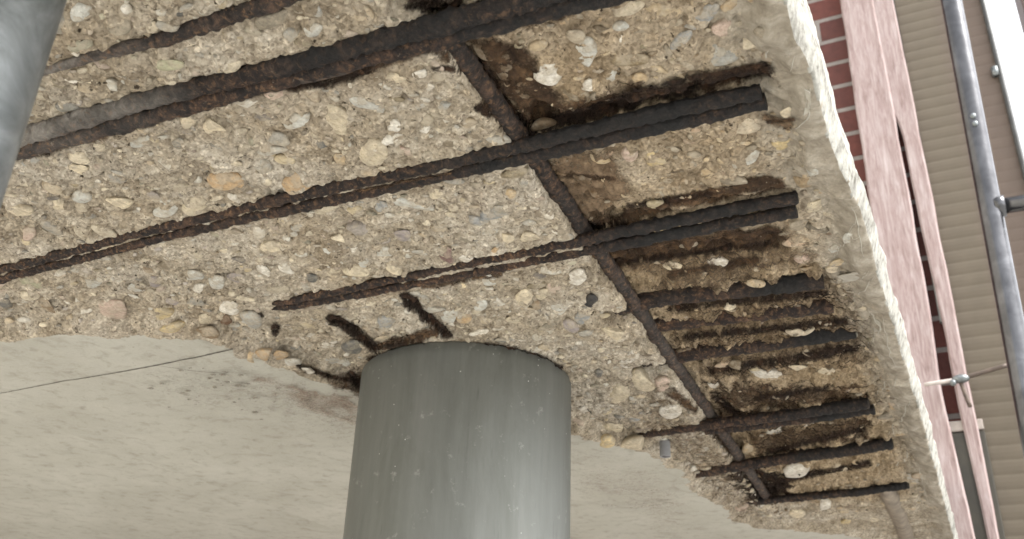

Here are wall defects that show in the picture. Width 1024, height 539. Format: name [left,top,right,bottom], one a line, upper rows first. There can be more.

spalling [0,52,512,265]
spalling [20,0,567,148]
rust [286,51,462,93]
rust [466,34,643,129]
rust [549,149,786,231]
rust [762,115,795,131]
crack [4,348,233,393]
spalling [0,160,898,539]
rust [421,272,503,289]
rust [479,343,563,370]
rust [632,231,871,417]
rust [640,384,873,517]